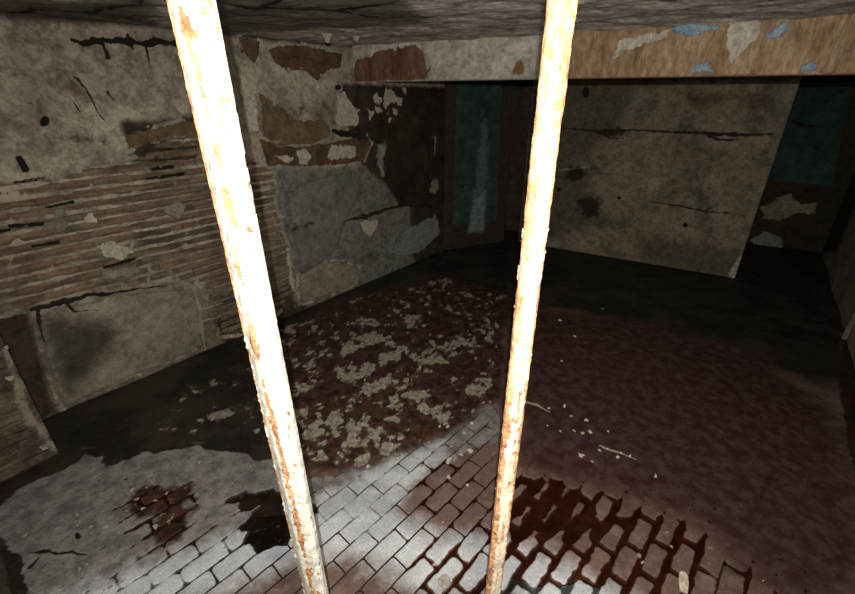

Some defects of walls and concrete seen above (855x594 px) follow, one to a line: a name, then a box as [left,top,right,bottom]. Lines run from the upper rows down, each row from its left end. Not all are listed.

crack [10,4,177,60]
peeling [236,35,434,123]
rust [512,61,524,74]
crack [560,128,774,141]
peeling [429,178,439,194]
crack [29,283,223,351]
spalling [0,0,387,594]
peeling [490,14,855,594]